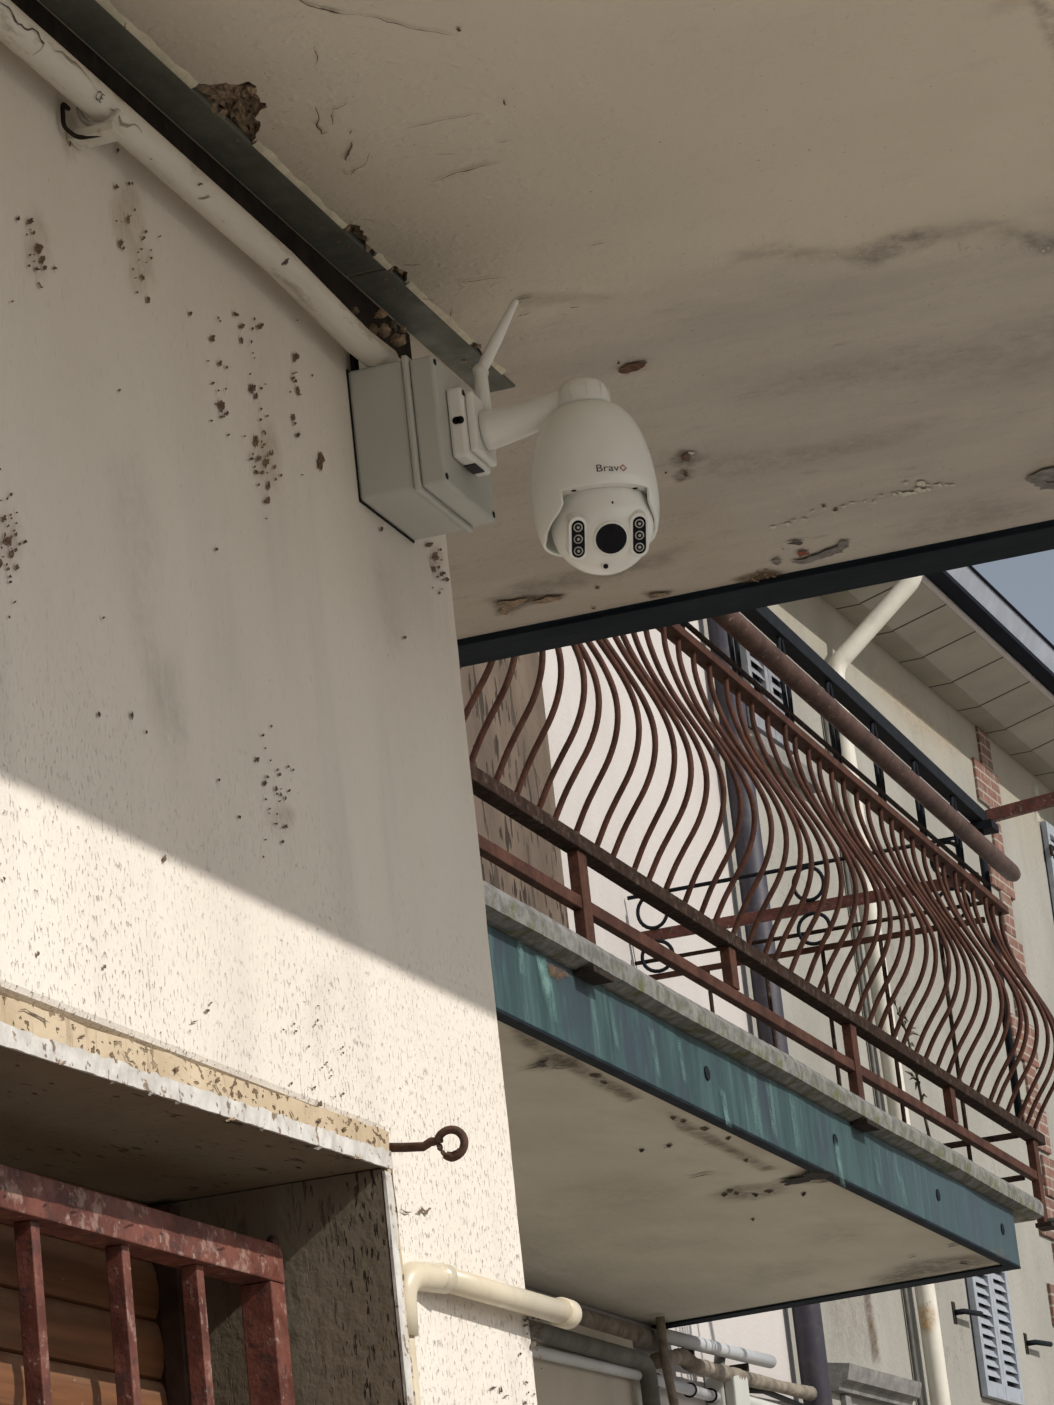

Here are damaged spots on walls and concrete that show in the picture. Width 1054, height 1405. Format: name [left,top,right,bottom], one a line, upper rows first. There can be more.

crack [300,0,461,35]
spalling [1026,468,1054,490]
peeling [770,481,954,565]